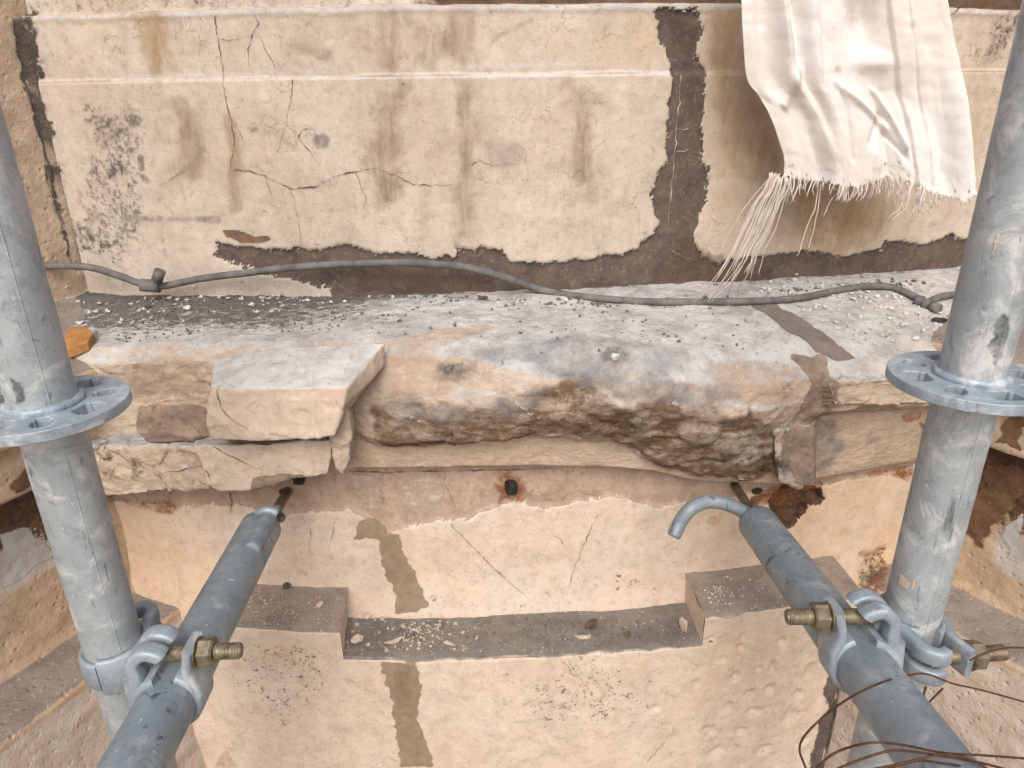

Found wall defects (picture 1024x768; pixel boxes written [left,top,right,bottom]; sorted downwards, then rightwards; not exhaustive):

damp [84,104,143,263]
crack [214,4,527,239]
spalling [213,7,968,300]
spalling [440,364,469,380]
crack [159,446,257,507]
damp [354,518,462,614]
crack [350,468,604,594]
peeling [574,619,598,639]
peeling [679,616,688,633]
damp [381,660,433,768]